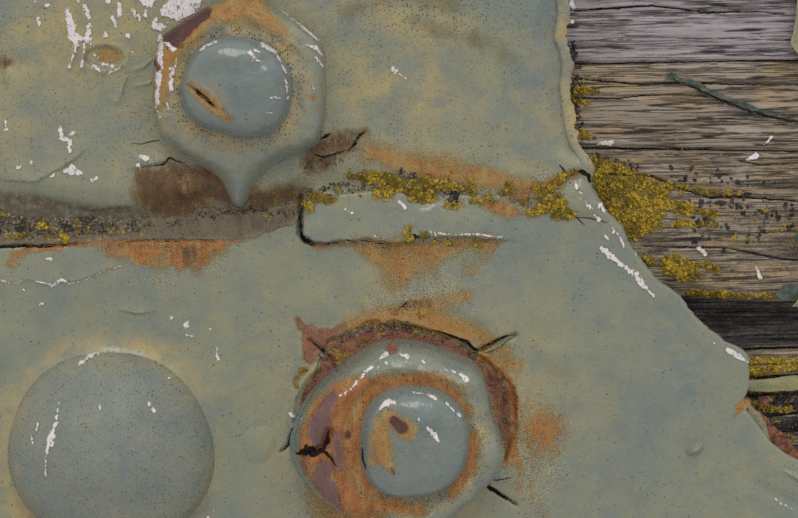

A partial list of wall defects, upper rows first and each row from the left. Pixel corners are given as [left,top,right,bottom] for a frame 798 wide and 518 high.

peeling [64,0,203,118]
corrosion [154,0,286,108]
peeling [247,42,290,99]
peeling [58,126,77,153]
peeling [50,163,98,182]
corrosion [131,160,234,214]
corrosion [301,128,581,219]
crack [299,195,420,247]
corrosion [7,238,248,270]
peeling [600,223,655,298]
crack [433,330,515,354]
corrosion [296,292,567,518]